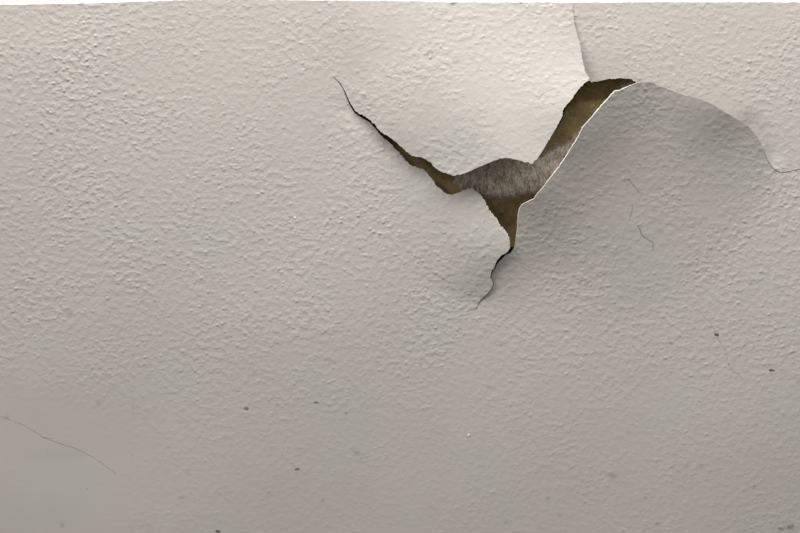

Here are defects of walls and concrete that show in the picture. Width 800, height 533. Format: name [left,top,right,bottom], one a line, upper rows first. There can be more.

peeling [322,0,636,312]